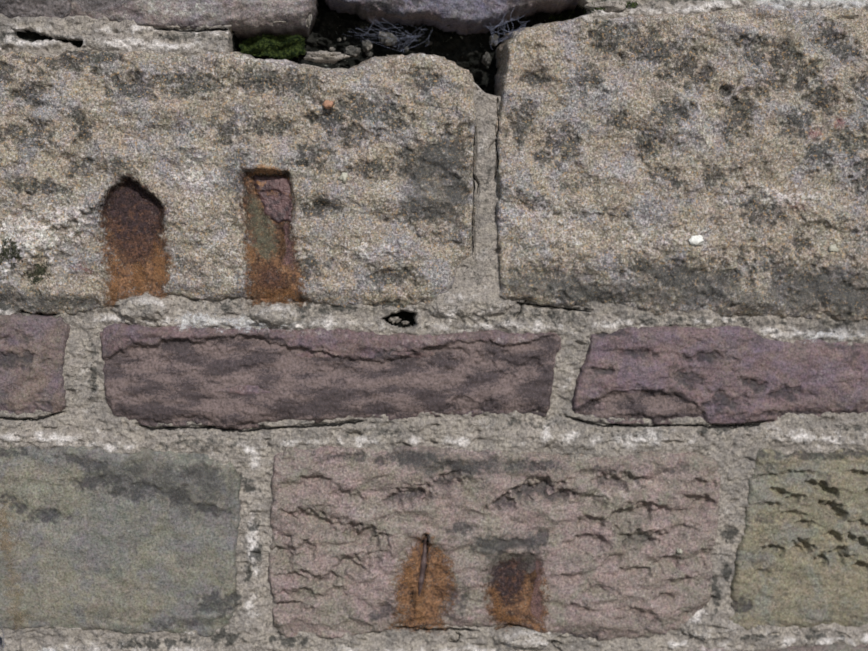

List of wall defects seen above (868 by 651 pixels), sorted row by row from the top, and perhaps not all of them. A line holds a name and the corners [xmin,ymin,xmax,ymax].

corrosion [97,174,175,307]
corrosion [239,164,310,306]
crack [472,97,500,259]
corrosion [389,533,458,632]
corrosion [480,556,550,633]